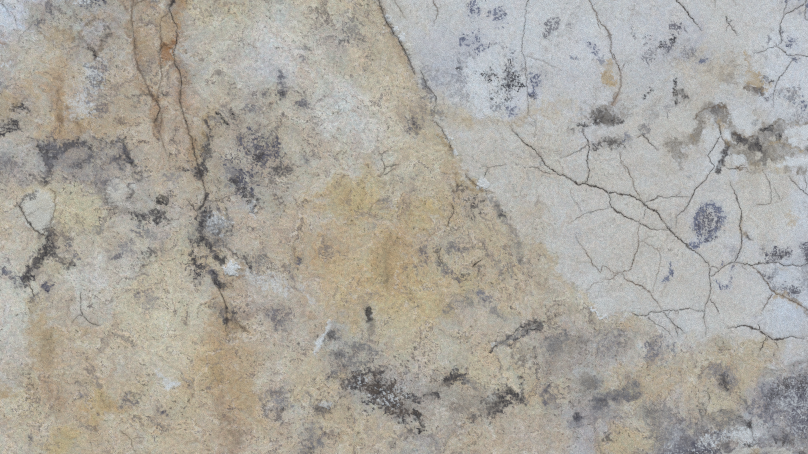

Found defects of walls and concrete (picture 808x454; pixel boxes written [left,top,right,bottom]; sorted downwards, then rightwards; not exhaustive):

crack [130,0,236,212]
crack [378,150,399,177]
crack [377,0,454,159]
damp [401,0,561,150]
crack [464,163,507,192]
damp [538,16,574,42]
crack [511,0,808,351]
damp [567,18,808,181]
damp [685,199,728,251]
crack [212,280,251,338]
damp [261,303,808,454]